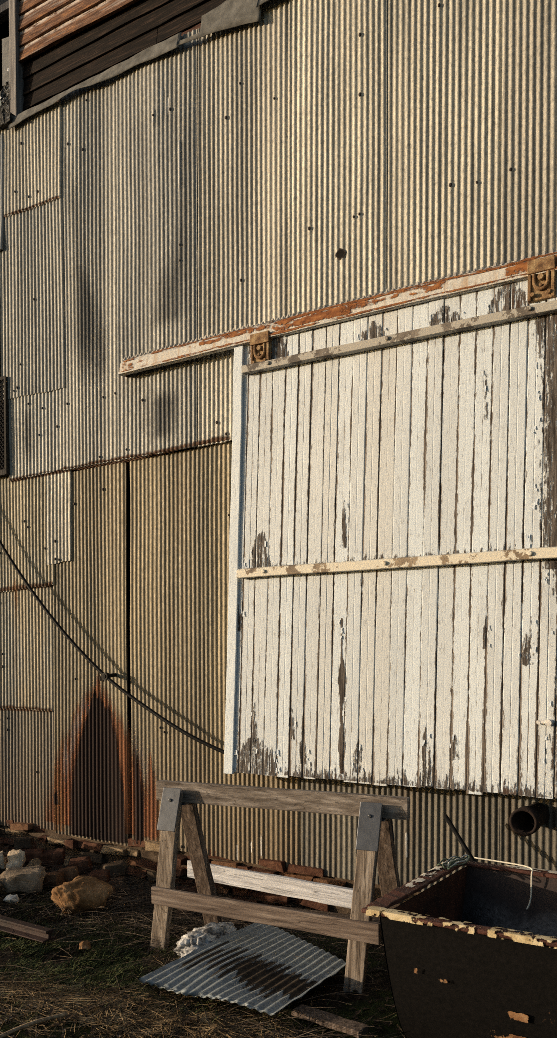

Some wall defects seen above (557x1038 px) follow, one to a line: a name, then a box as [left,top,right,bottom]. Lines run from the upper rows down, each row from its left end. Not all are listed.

peeling [271,336,288,360]
rust [121,252,557,372]
peeling [356,321,386,341]
peeling [429,306,463,326]
peeling [486,282,527,314]
peeling [527,313,557,615]
peeling [243,532,283,569]
peeling [342,503,515,561]
peeling [234,616,557,798]
rust [46,676,158,845]